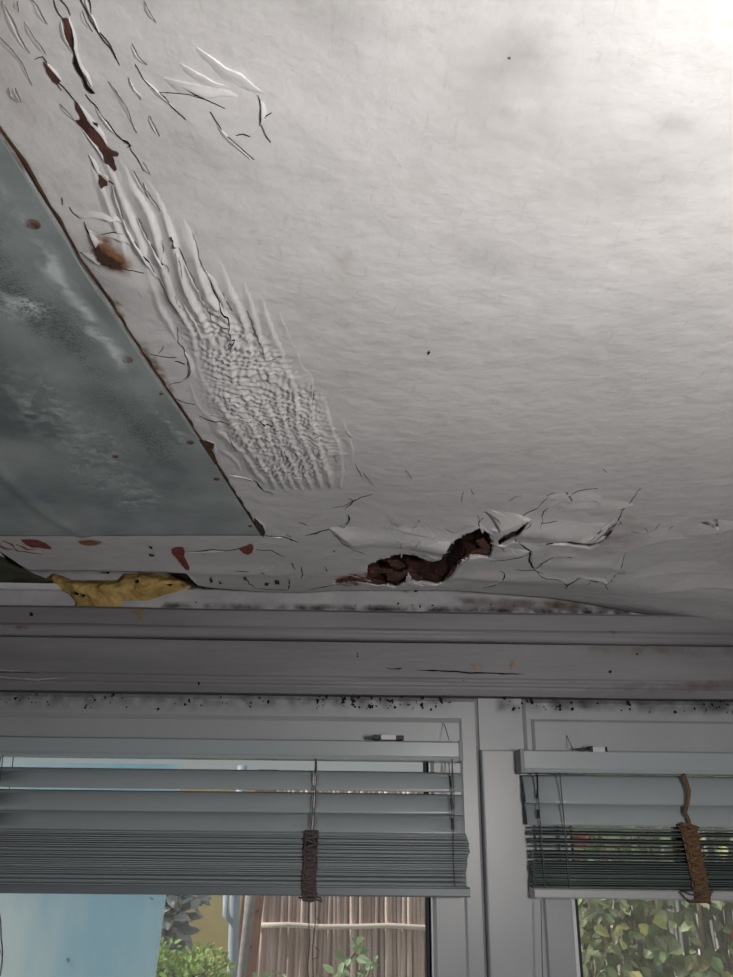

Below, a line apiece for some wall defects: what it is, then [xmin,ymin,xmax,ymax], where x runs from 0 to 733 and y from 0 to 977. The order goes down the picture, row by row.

crack [0,0,186,211]
crack [211,96,271,161]
crack [61,197,145,274]
rust [0,126,262,535]
crack [170,236,282,376]
crack [151,328,290,462]
spalling [336,524,530,592]
crack [461,469,673,590]
mould [316,695,451,711]
damp [503,697,599,711]